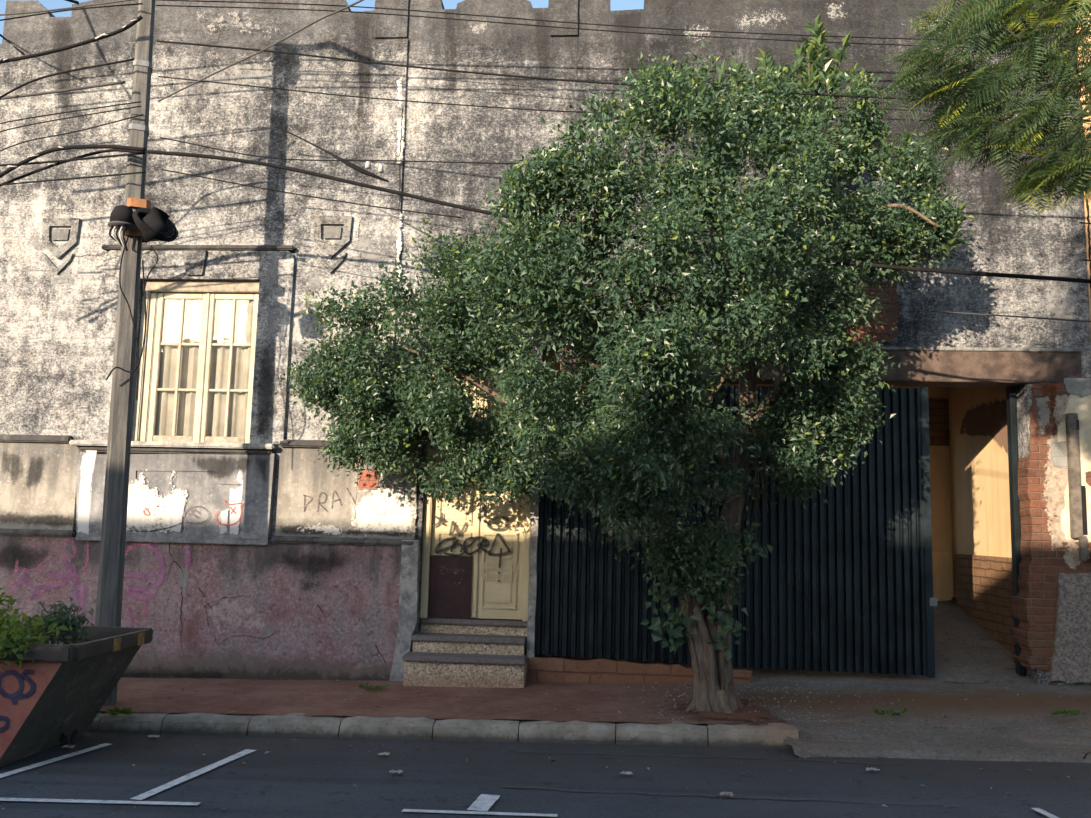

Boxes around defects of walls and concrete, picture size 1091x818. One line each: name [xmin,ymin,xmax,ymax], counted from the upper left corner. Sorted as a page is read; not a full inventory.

leakage [258,349,284,432]
spalling [929,398,1008,453]
leakage [0,450,97,535]
peeling [126,469,188,533]
peeling [297,470,417,537]
spalling [1043,394,1091,570]
crack [166,537,213,651]